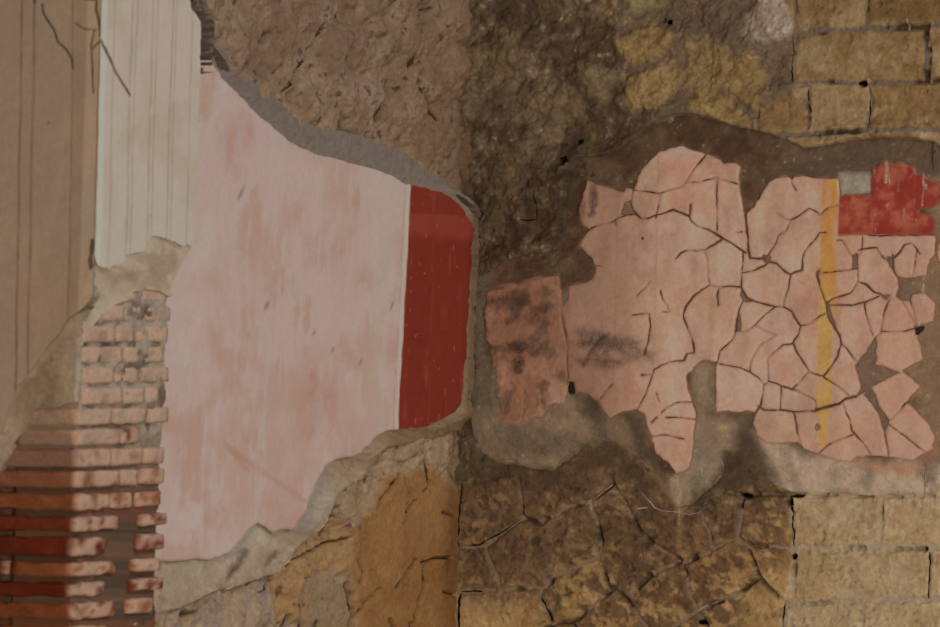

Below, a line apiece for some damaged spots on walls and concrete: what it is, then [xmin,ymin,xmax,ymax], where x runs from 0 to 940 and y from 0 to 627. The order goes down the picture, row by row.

crack [34,0,130,95]
flaking render [741,165,768,210]
flaking render [840,175,871,196]
flaking render [564,248,593,289]
flaking render [897,277,925,300]
crack [619,190,919,453]
flaking render [687,362,715,412]
flaking render [856,338,897,390]
crack [791,494,805,545]
crack [396,483,521,627]